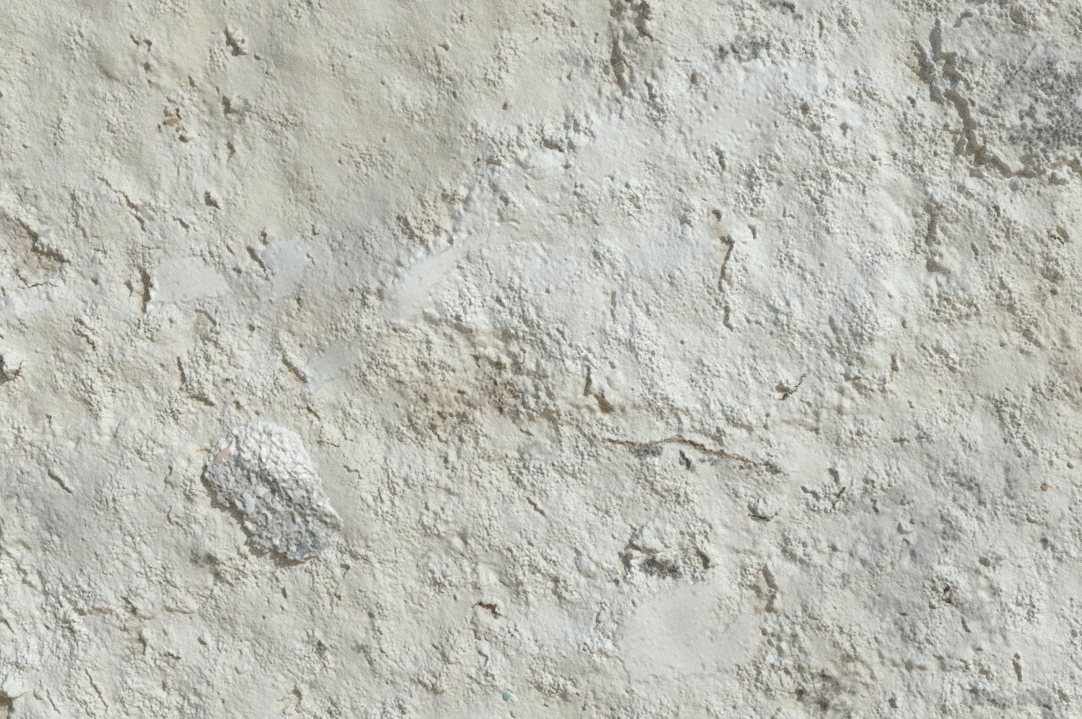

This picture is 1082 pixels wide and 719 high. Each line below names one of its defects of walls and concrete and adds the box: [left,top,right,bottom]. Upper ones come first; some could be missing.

crack [602,437,768,466]